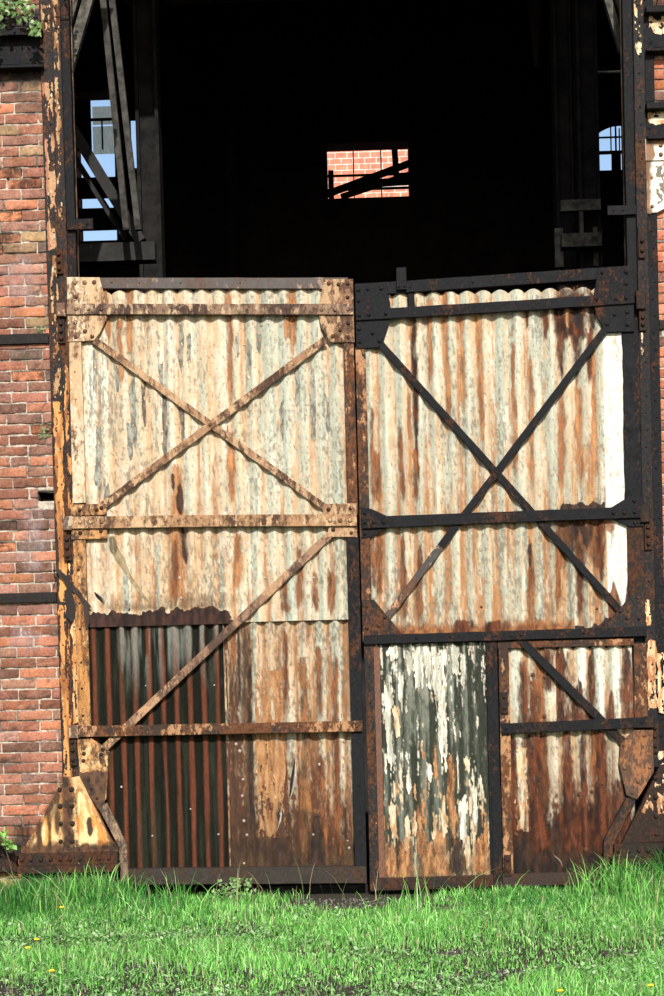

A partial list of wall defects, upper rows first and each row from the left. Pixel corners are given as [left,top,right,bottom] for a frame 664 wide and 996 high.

peeling [647,111,664,125]
peeling [656,166,664,204]
peeling [0,0,78,778]
corrosion [171,465,184,515]
corrosion [398,290,466,500]
corrosion [399,501,629,634]
corrosion [542,287,598,491]
corrosion [56,527,355,867]
peeling [383,643,479,870]
corrosion [511,646,635,874]
peeling [641,751,664,814]
peeling [647,639,664,714]